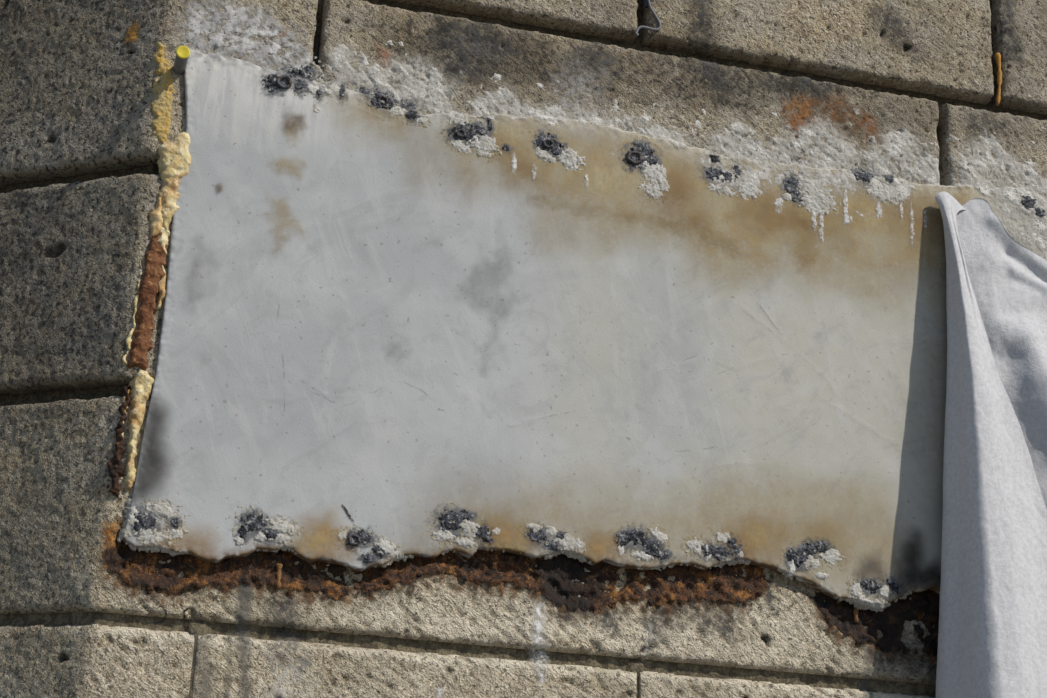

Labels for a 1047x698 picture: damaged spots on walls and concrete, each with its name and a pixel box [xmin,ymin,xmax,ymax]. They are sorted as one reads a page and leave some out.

water stain [285,117,302,134]
water stain [322,18,1047,276]
rust [102,519,773,619]
rust [805,589,940,665]